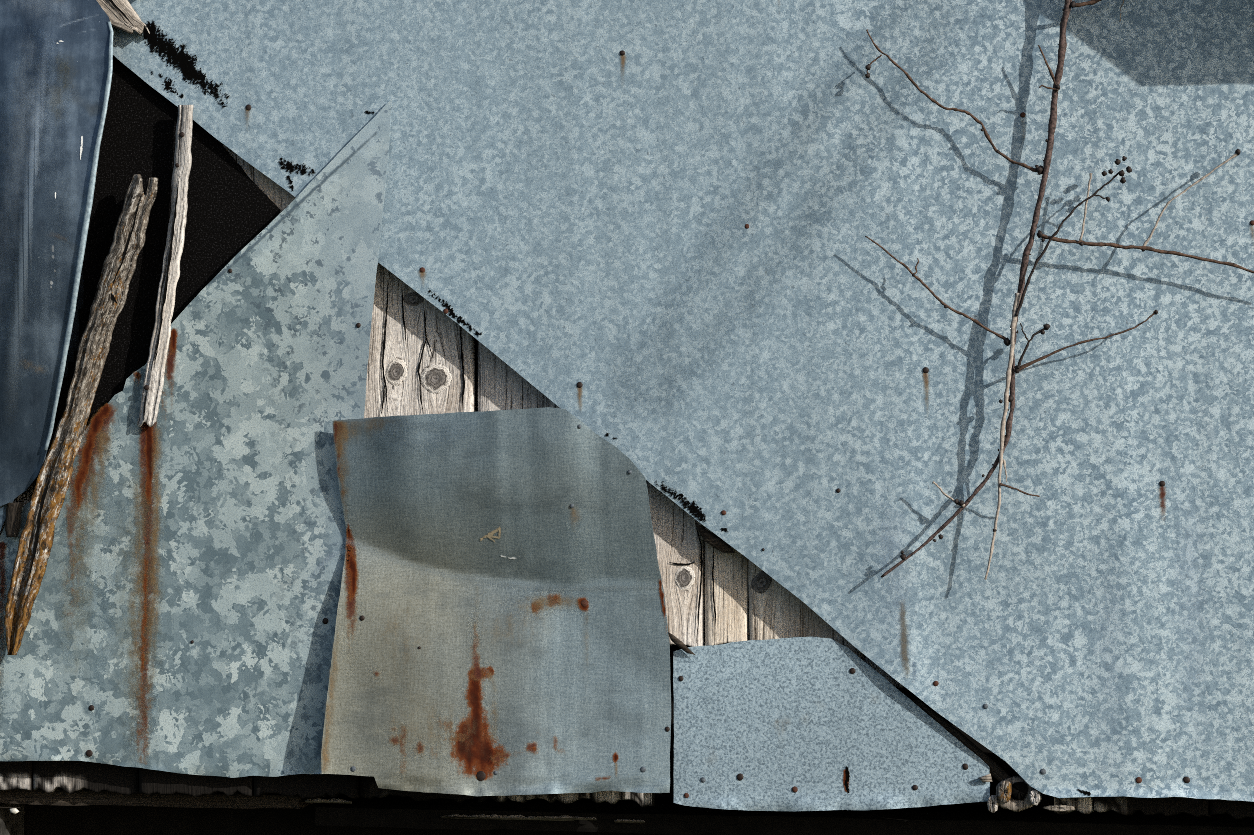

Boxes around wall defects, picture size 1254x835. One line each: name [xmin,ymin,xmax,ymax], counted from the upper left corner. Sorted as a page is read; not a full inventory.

rust [67,404,116,590]
rust [136,422,160,760]
rust [345,524,357,628]
rust [532,594,589,613]
rust [444,643,510,780]
rust [843,766,851,793]